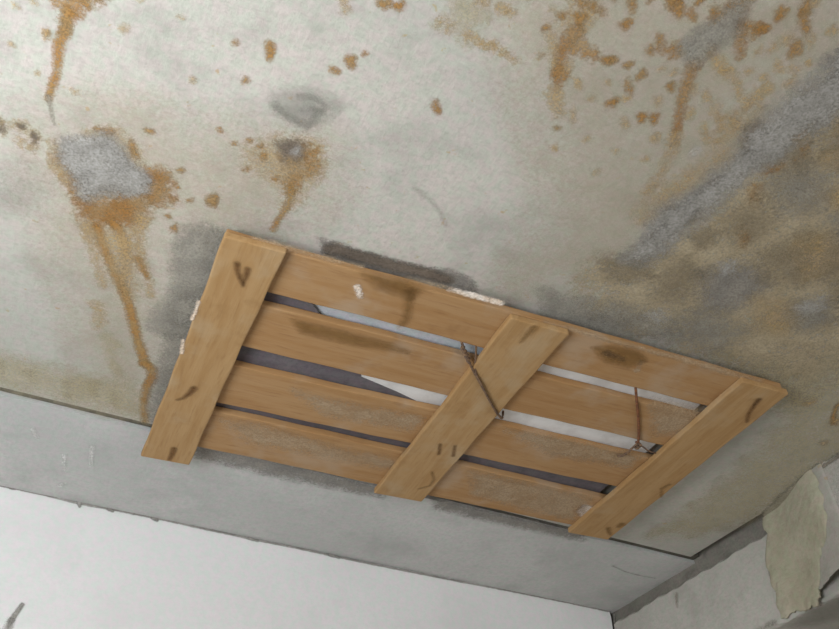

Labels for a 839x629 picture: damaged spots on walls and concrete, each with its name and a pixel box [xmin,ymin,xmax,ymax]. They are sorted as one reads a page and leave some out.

corrosion [45,0,102,115]
corrosion [265,41,276,61]
corrosion [330,52,367,74]
corrosion [377,0,404,10]
corrosion [542,0,646,114]
corrosion [666,0,705,21]
corrosion [775,0,820,73]
corrosion [247,135,324,231]
corrosion [51,127,191,423]
damp [545,116,839,405]